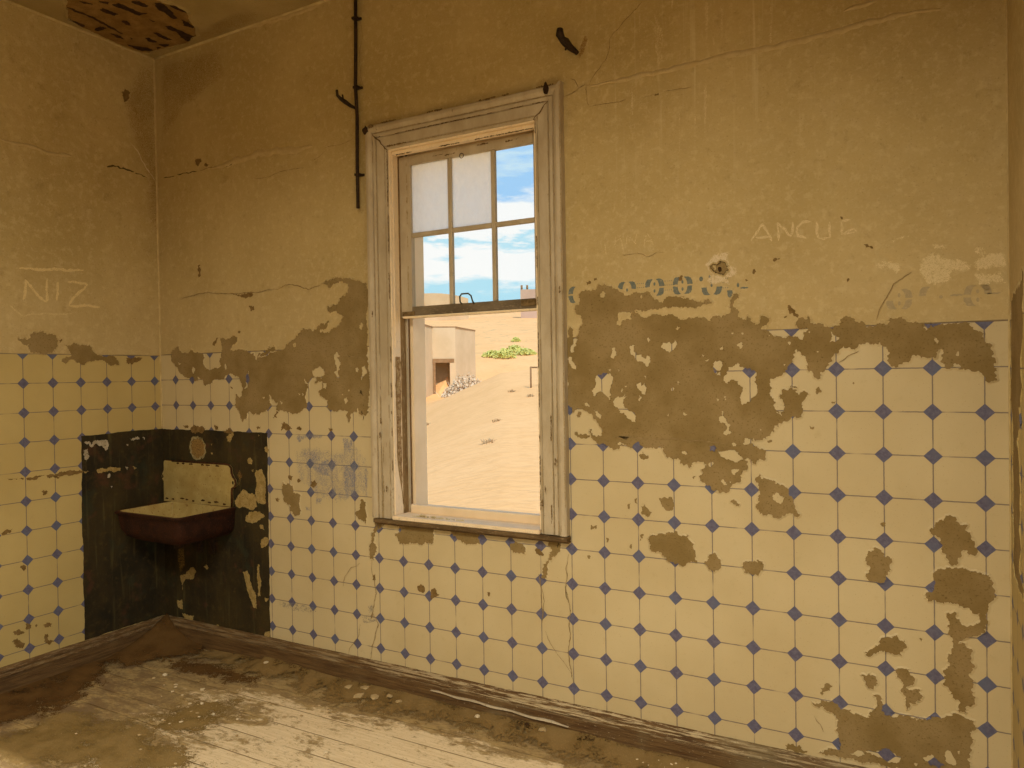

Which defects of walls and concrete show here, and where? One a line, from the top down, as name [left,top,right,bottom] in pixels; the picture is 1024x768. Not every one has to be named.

crack [107,164,232,178]
crack [184,284,320,298]
spalling [16,330,142,367]
spalling [170,83,1024,604]
spalling [785,513,999,768]